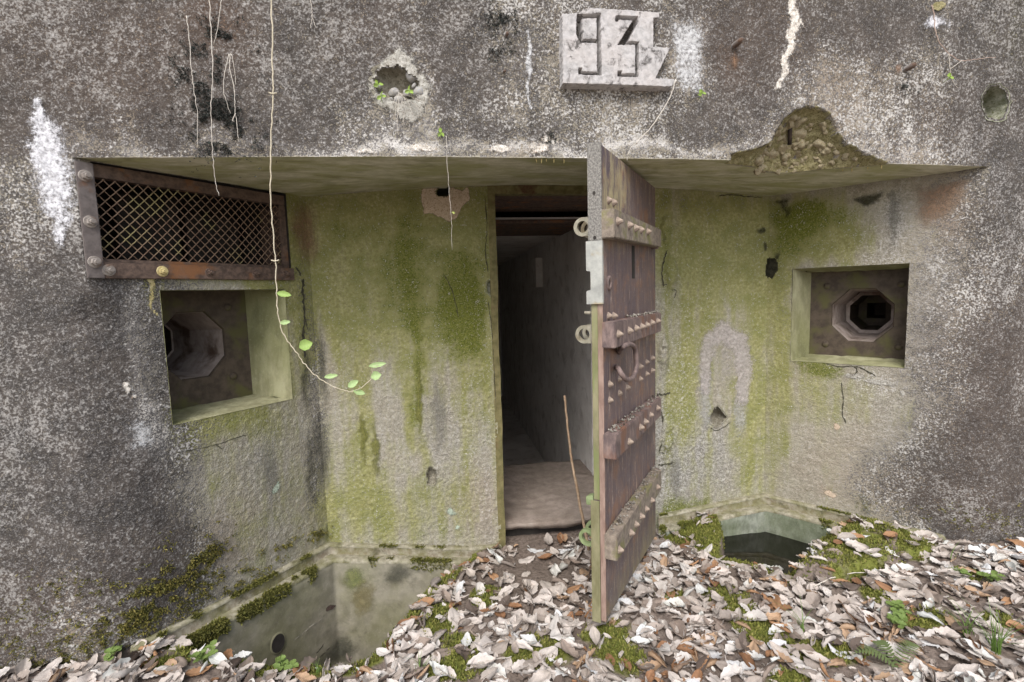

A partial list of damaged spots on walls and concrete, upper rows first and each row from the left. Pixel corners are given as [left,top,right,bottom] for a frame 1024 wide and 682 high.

leakage [774,0,806,89]
spalling [368,47,433,122]
leakage [26,98,76,246]
peeling [421,187,470,222]
spalling [725,106,887,176]
leakage [416,369,445,439]
crack [827,364,875,423]
leakage [359,419,380,472]